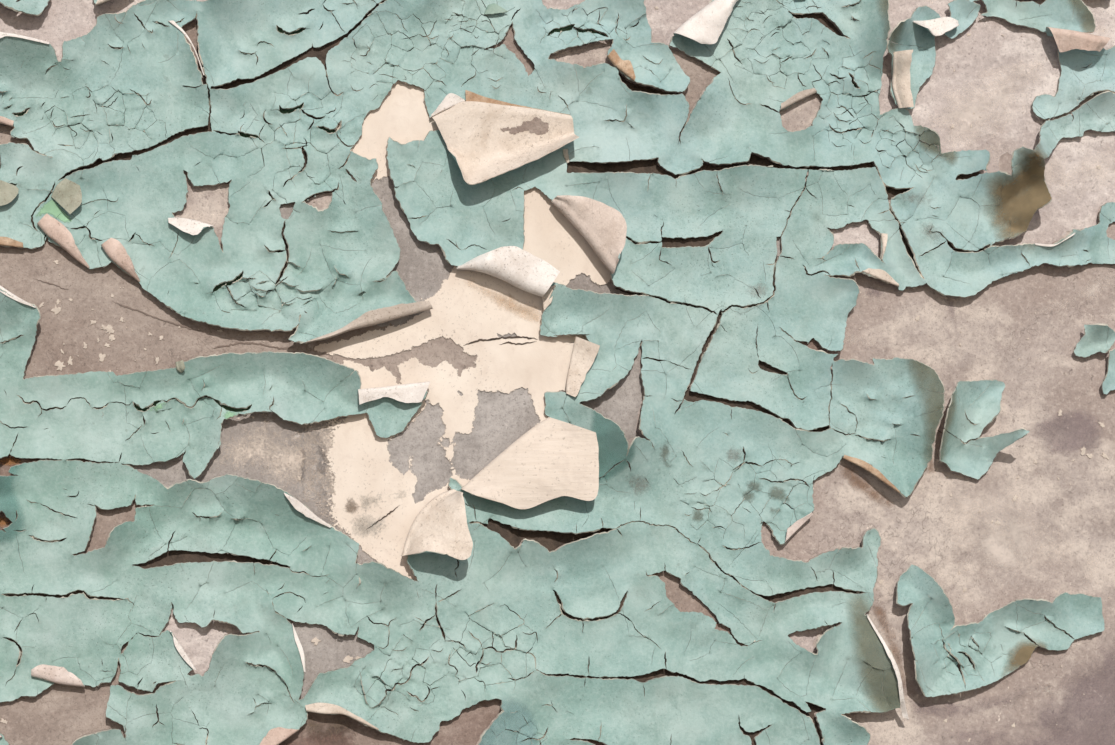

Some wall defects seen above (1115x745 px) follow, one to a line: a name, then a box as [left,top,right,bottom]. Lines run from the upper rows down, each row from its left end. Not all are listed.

crack [547,8,638,41]
crack [14,0,384,306]
crack [567,3,986,268]
water stain [993,151,1052,237]
crack [5,396,274,461]
peeling [0,148,945,745]
crack [463,336,537,346]
crack [615,256,942,442]
peeling [761,0,1115,745]
crack [2,587,120,684]
crack [134,533,328,611]
crack [363,449,863,745]